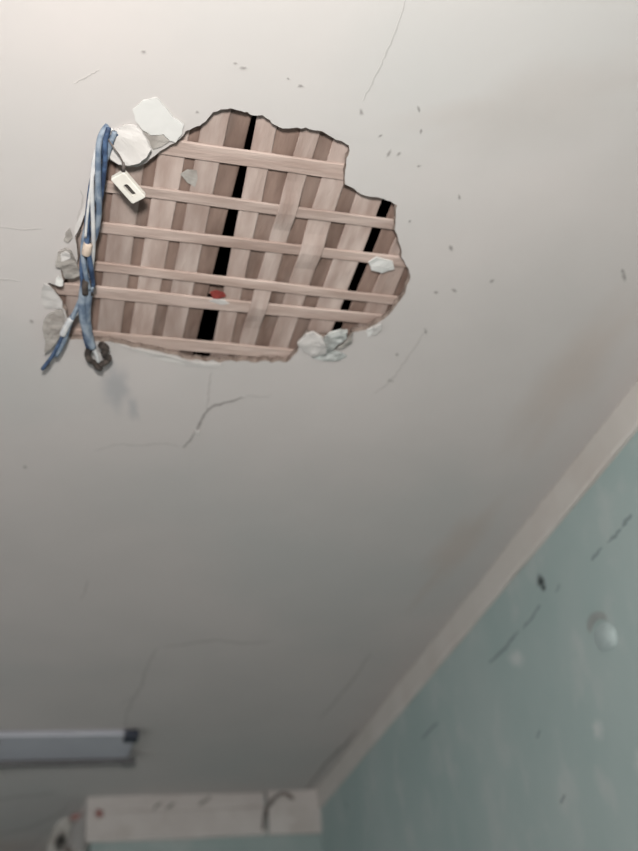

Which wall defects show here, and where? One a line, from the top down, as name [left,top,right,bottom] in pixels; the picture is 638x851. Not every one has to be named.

crack [362,0,406,101]
spalling [101,97,185,166]
spalling [28,189,86,354]
spalling [94,201,410,368]
crack [91,371,272,452]